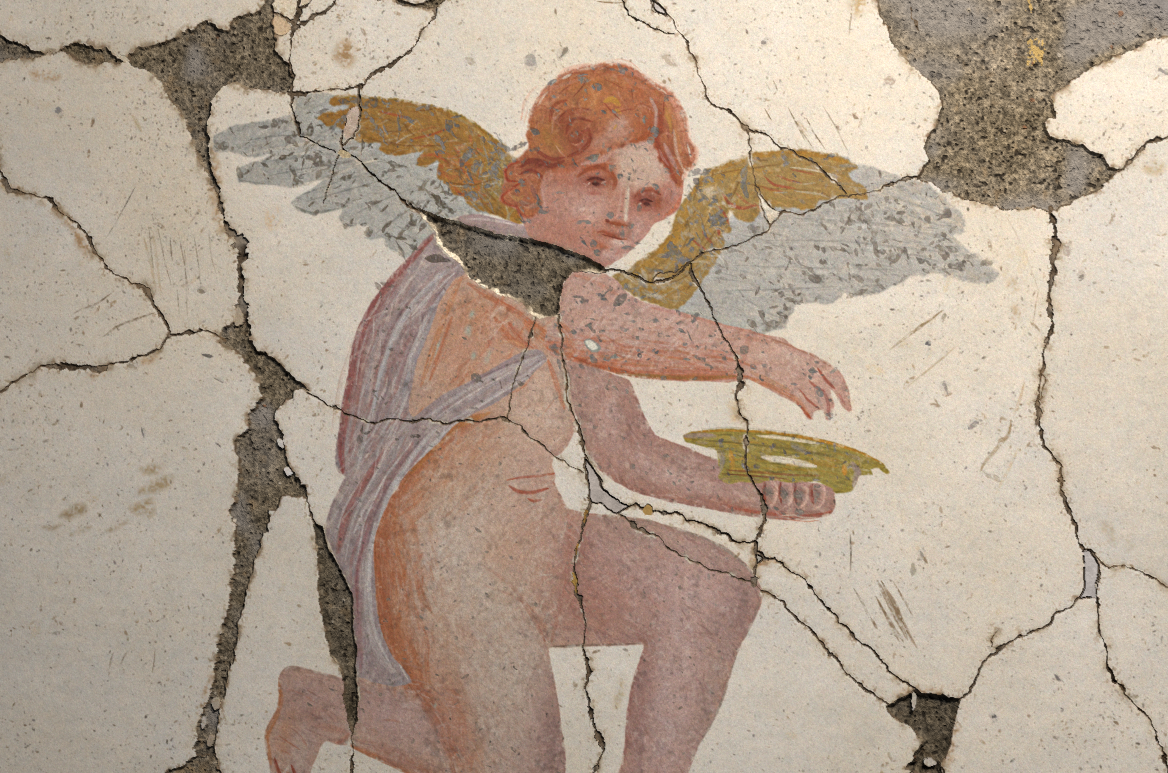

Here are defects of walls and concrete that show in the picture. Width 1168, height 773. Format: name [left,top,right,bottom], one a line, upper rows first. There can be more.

crack [0,166,250,394]
spalling [167,322,309,773]
spalling [313,524,365,733]
crack [271,0,438,214]
spalling [0,0,1168,382]
crack [306,0,921,773]
peeling [718,437,851,517]
peeling [785,362,837,420]
spalling [886,689,961,773]
crack [959,206,1168,768]
crack [1119,136,1168,173]